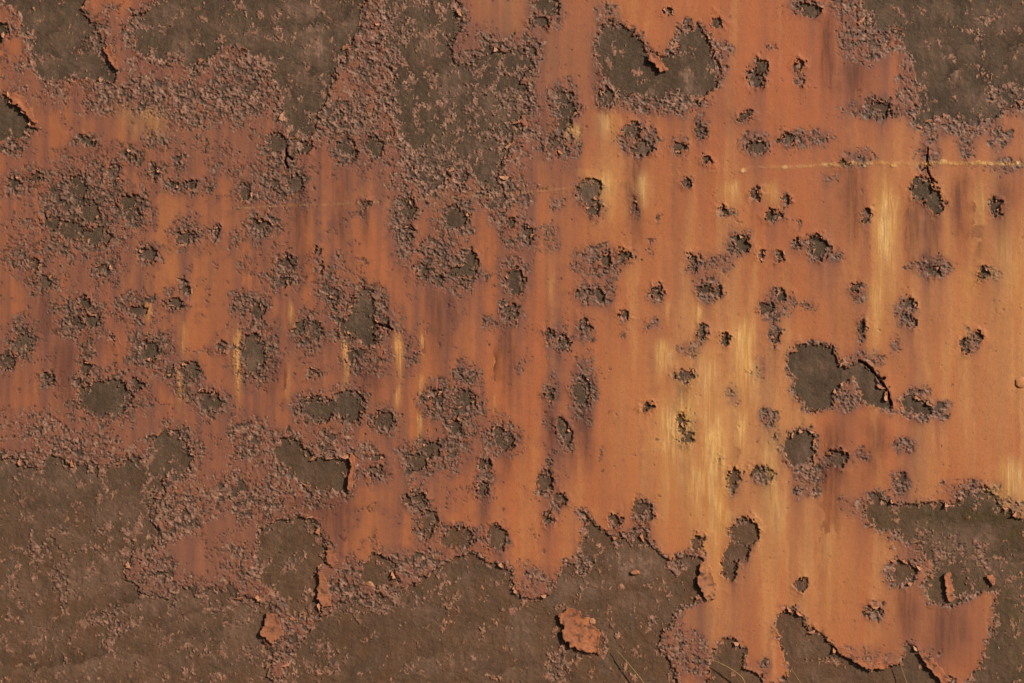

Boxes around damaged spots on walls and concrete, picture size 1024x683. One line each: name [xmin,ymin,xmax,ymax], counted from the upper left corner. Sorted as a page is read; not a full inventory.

peeling [0,0,550,229]
corrosion [534,54,714,167]
peeling [586,1,736,121]
corrosion [717,184,833,263]
peeling [823,0,1024,153]
crack [921,147,1020,189]
corrosion [0,132,539,552]
peeling [0,405,1024,683]
corrosion [539,241,643,457]
corrosion [642,400,777,582]
peeling [767,340,953,502]
crack [858,360,893,406]